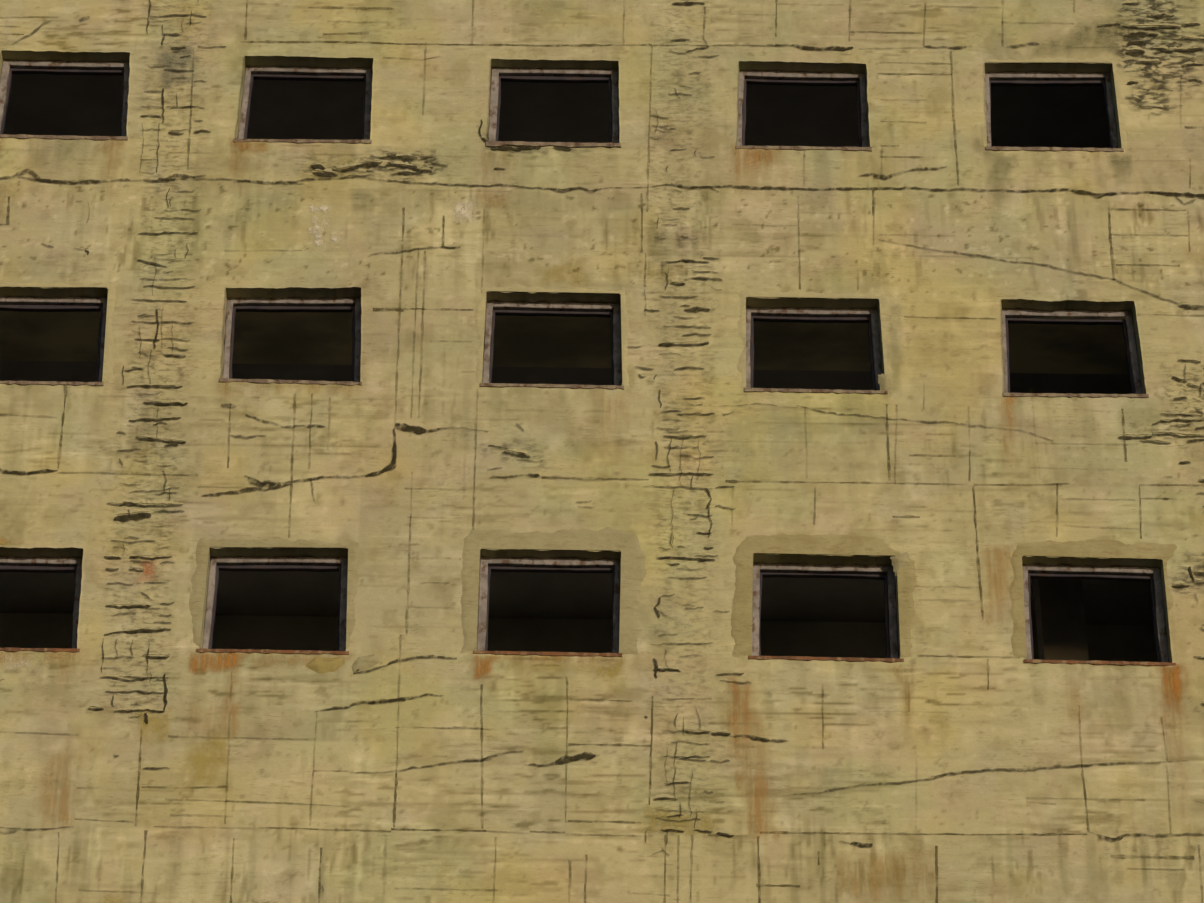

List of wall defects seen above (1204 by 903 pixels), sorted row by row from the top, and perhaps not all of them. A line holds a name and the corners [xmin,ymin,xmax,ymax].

spalling [1097,0,1204,109]
crack [0,169,357,184]
spalling [311,151,447,178]
crack [389,167,1204,205]
spalling [117,88,211,466]
spalling [644,257,723,346]
crack [954,251,1204,310]
crack [201,475,334,496]
crack [231,414,325,439]
crack [366,423,446,477]
spalling [635,366,735,579]
spalling [88,536,175,724]